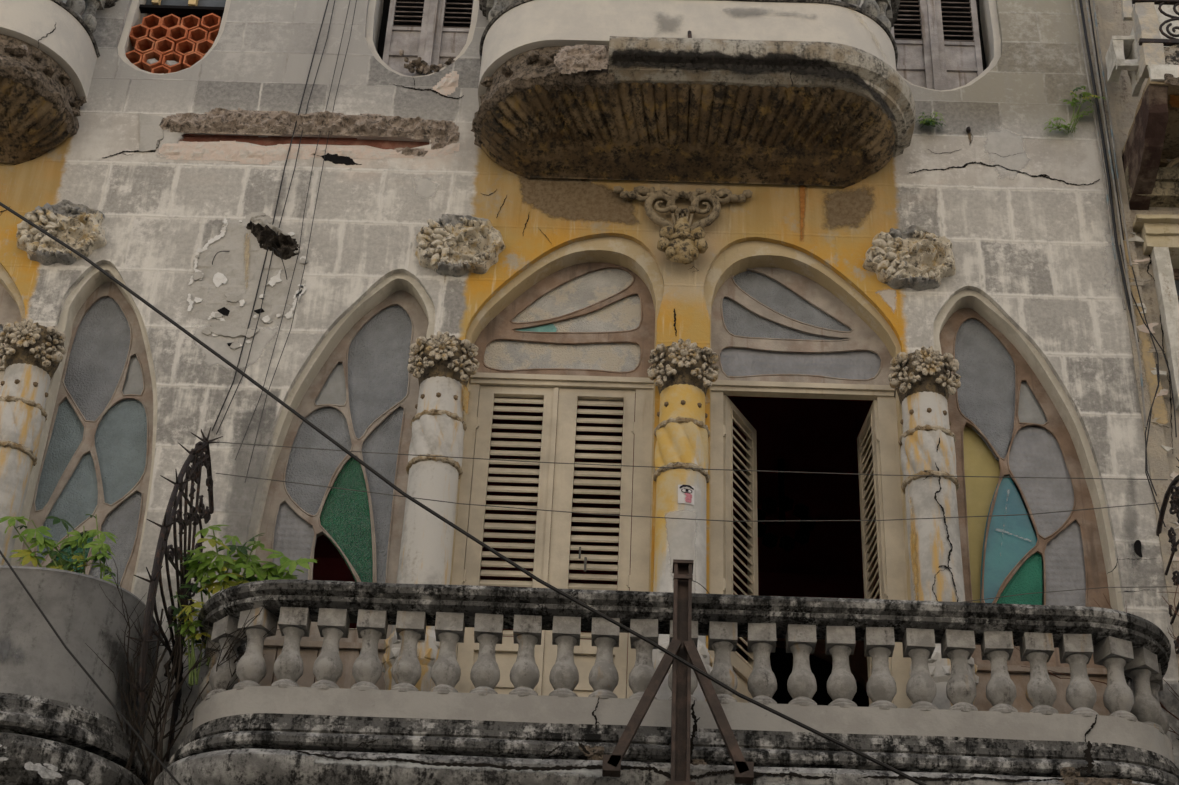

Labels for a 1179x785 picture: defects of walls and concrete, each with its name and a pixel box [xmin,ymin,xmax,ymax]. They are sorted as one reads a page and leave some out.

spalling [0,43,87,138]
spalling [139,44,615,165]
crack [103,141,160,158]
damp [519,175,639,224]
crack [909,132,1100,186]
flaking render [187,212,307,350]
crack [923,437,958,602]
damp [313,756,609,777]
crack [279,698,1097,782]